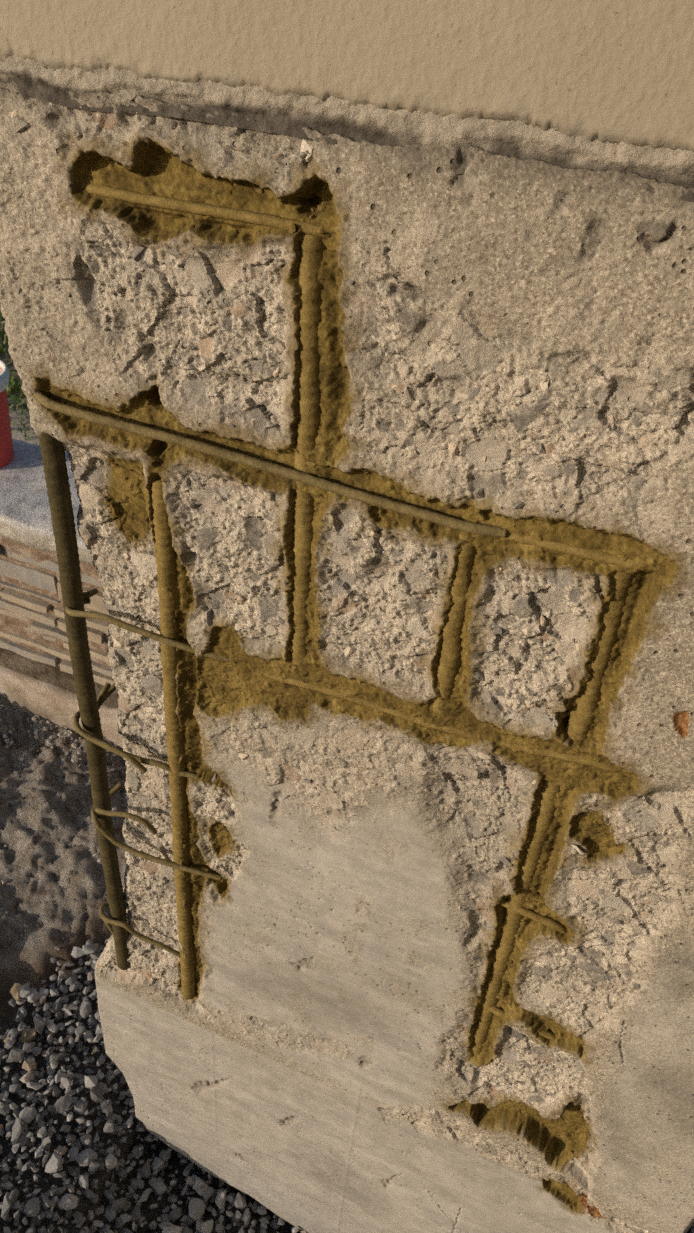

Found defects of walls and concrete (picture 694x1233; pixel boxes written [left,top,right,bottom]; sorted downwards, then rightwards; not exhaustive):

spalling [450,144,489,212]
spalling [0,81,323,445]
spalling [578,208,612,268]
spalling [636,218,685,258]
spalling [343,232,694,538]
corrosion [672,711,690,739]
spalling [62,442,694,1233]